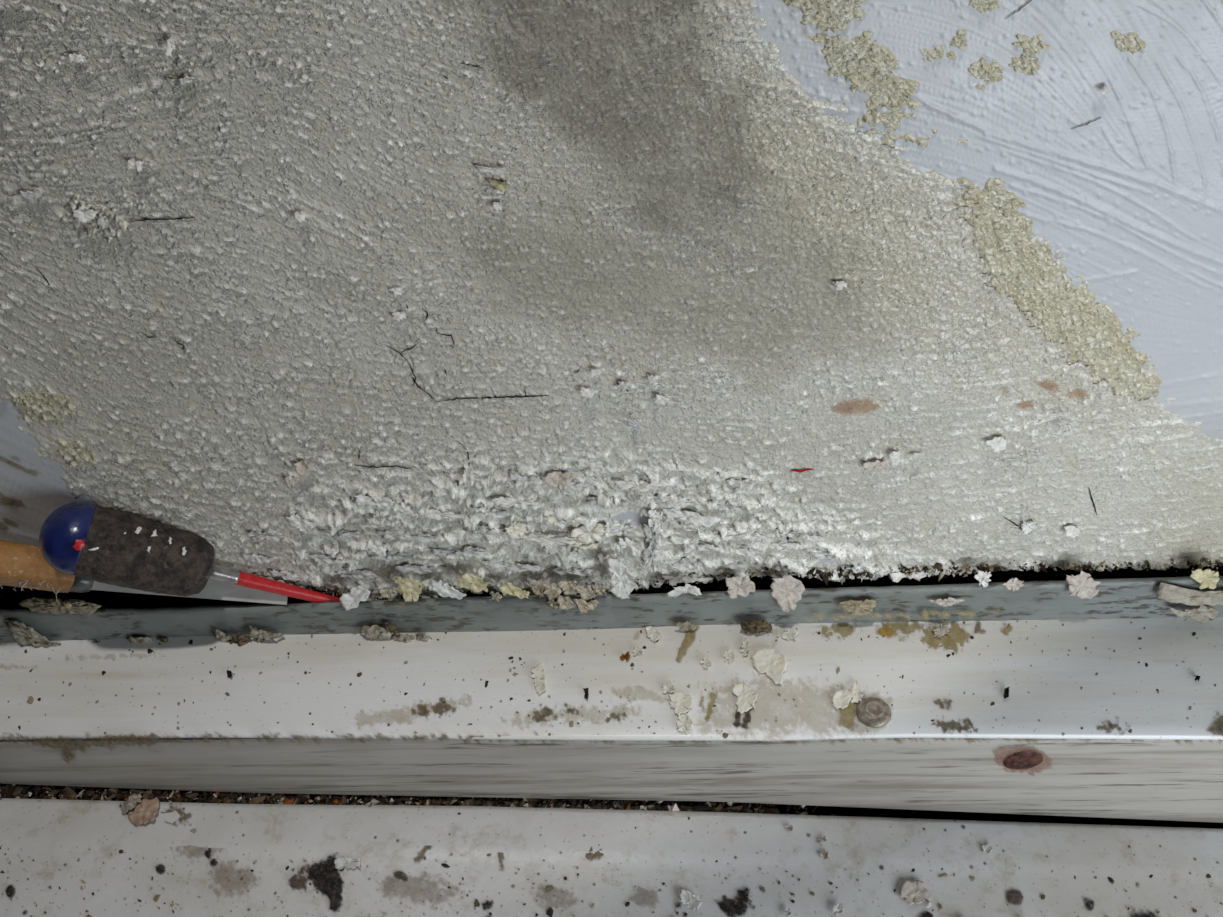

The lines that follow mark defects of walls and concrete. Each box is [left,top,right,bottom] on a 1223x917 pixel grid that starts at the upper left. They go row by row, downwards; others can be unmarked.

peeling [967,0,1002,14]
peeling [782,0,973,155]
peeling [920,29,1050,92]
peeling [1110,30,1146,55]
peeling [951,177,1161,400]
crack [386,304,549,402]
peeling [12,387,97,468]
peeling [55,241,1223,613]
spalling [0,585,269,610]
peeling [751,622,799,684]
peeling [732,681,758,714]
peeling [832,680,864,710]